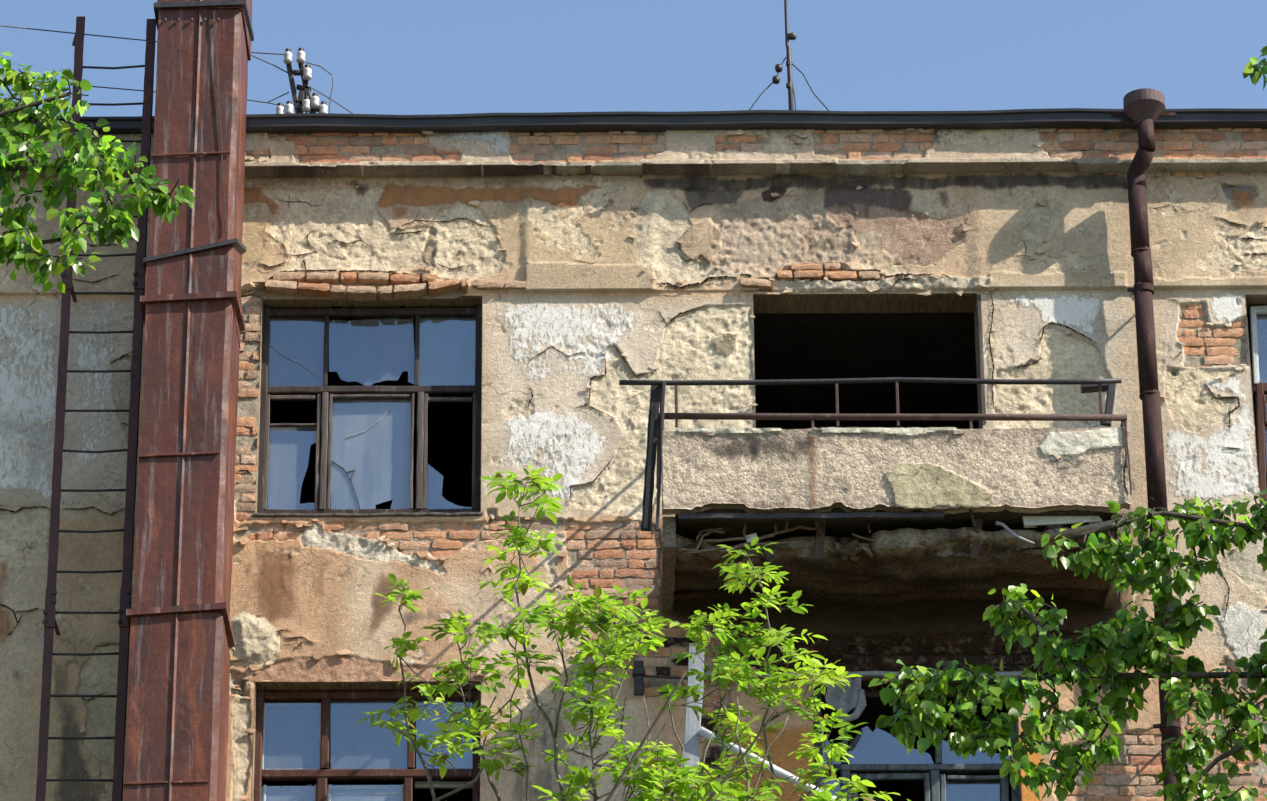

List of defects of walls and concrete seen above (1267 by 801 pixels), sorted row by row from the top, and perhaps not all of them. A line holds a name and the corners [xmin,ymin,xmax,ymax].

crack [241,197,492,287]
flaking render [245,128,990,296]
crack [1153,205,1267,255]
flaking render [994,293,1110,429]
peeling [1160,294,1260,500]
flaking render [230,186,816,801]
flaking render [748,630,1114,691]
leakage [58,704,98,801]